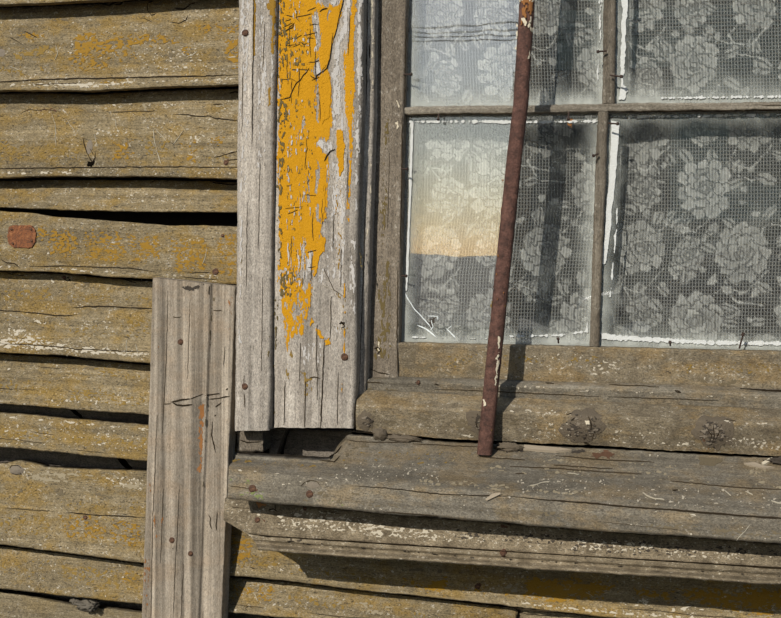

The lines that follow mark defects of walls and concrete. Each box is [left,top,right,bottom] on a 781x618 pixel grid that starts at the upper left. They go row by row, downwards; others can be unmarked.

crack [0,0,265,131]
crack [0,259,154,283]
crack [0,139,237,186]
peeling [0,0,375,396]
crack [185,272,221,311]
crack [246,171,263,311]
crack [0,295,262,614]